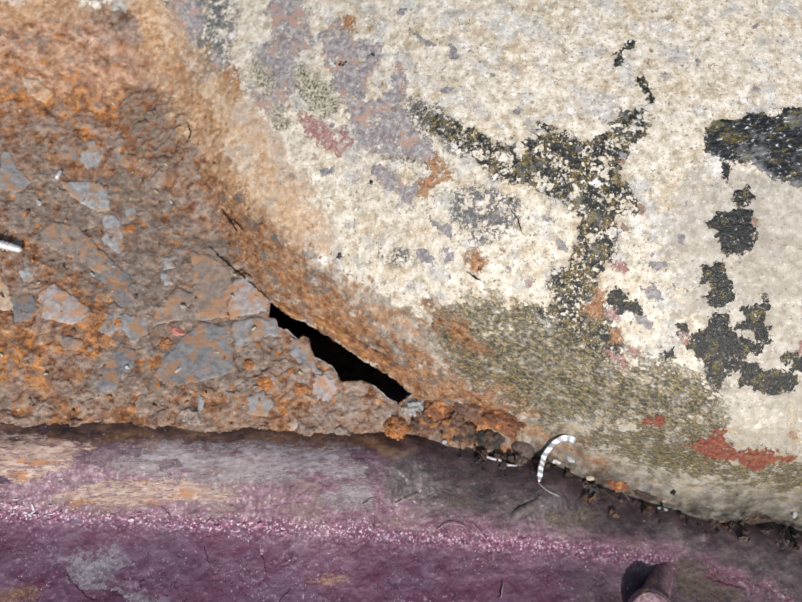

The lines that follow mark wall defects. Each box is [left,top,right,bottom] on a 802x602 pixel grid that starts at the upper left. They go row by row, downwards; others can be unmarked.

peeling [169,0,208,44]
peeling [447,43,459,60]
corrosion [21,76,54,103]
corrosion [176,65,242,152]
peeling [240,0,436,209]
corrosion [0,150,32,192]
corrosion [59,140,101,169]
corrosion [295,110,354,159]
corrosion [96,132,509,412]
corrosion [12,293,38,322]
corrosion [246,391,273,417]
corrosion [685,426,798,472]